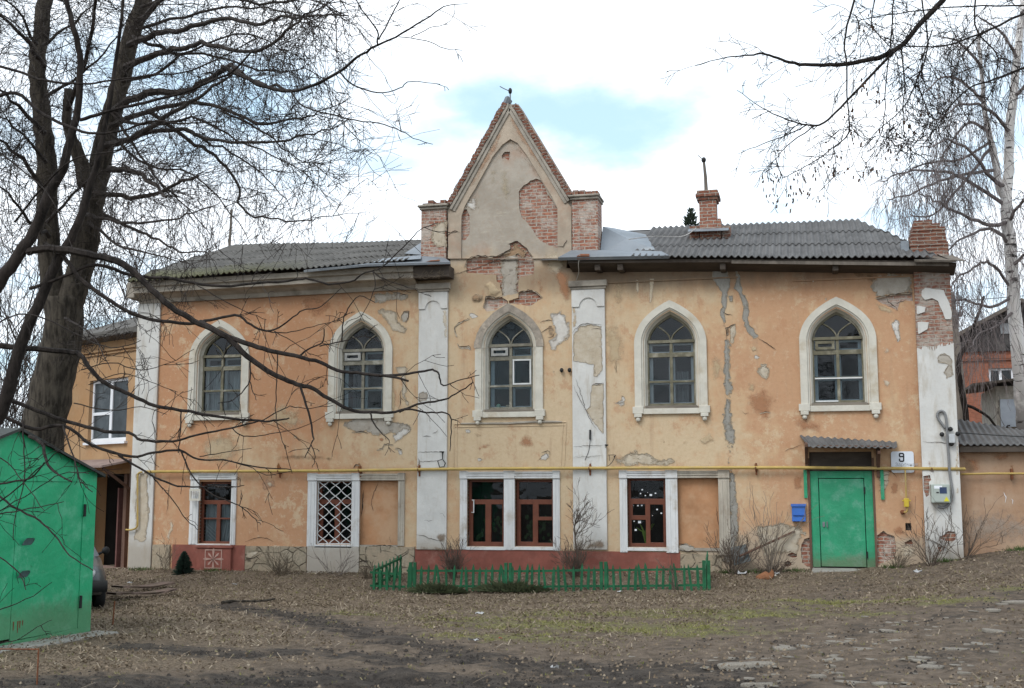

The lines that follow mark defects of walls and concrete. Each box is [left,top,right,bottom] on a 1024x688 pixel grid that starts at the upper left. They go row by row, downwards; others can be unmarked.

flaking render [431,220,448,247]
flaking render [519,179,558,248]
flaking render [466,241,542,319]
flaking render [548,308,576,350]
flaking render [870,273,913,352]
flaking render [938,353,953,379]
flaking render [343,366,411,455]
flaking render [616,450,675,466]
flaking render [874,531,914,566]